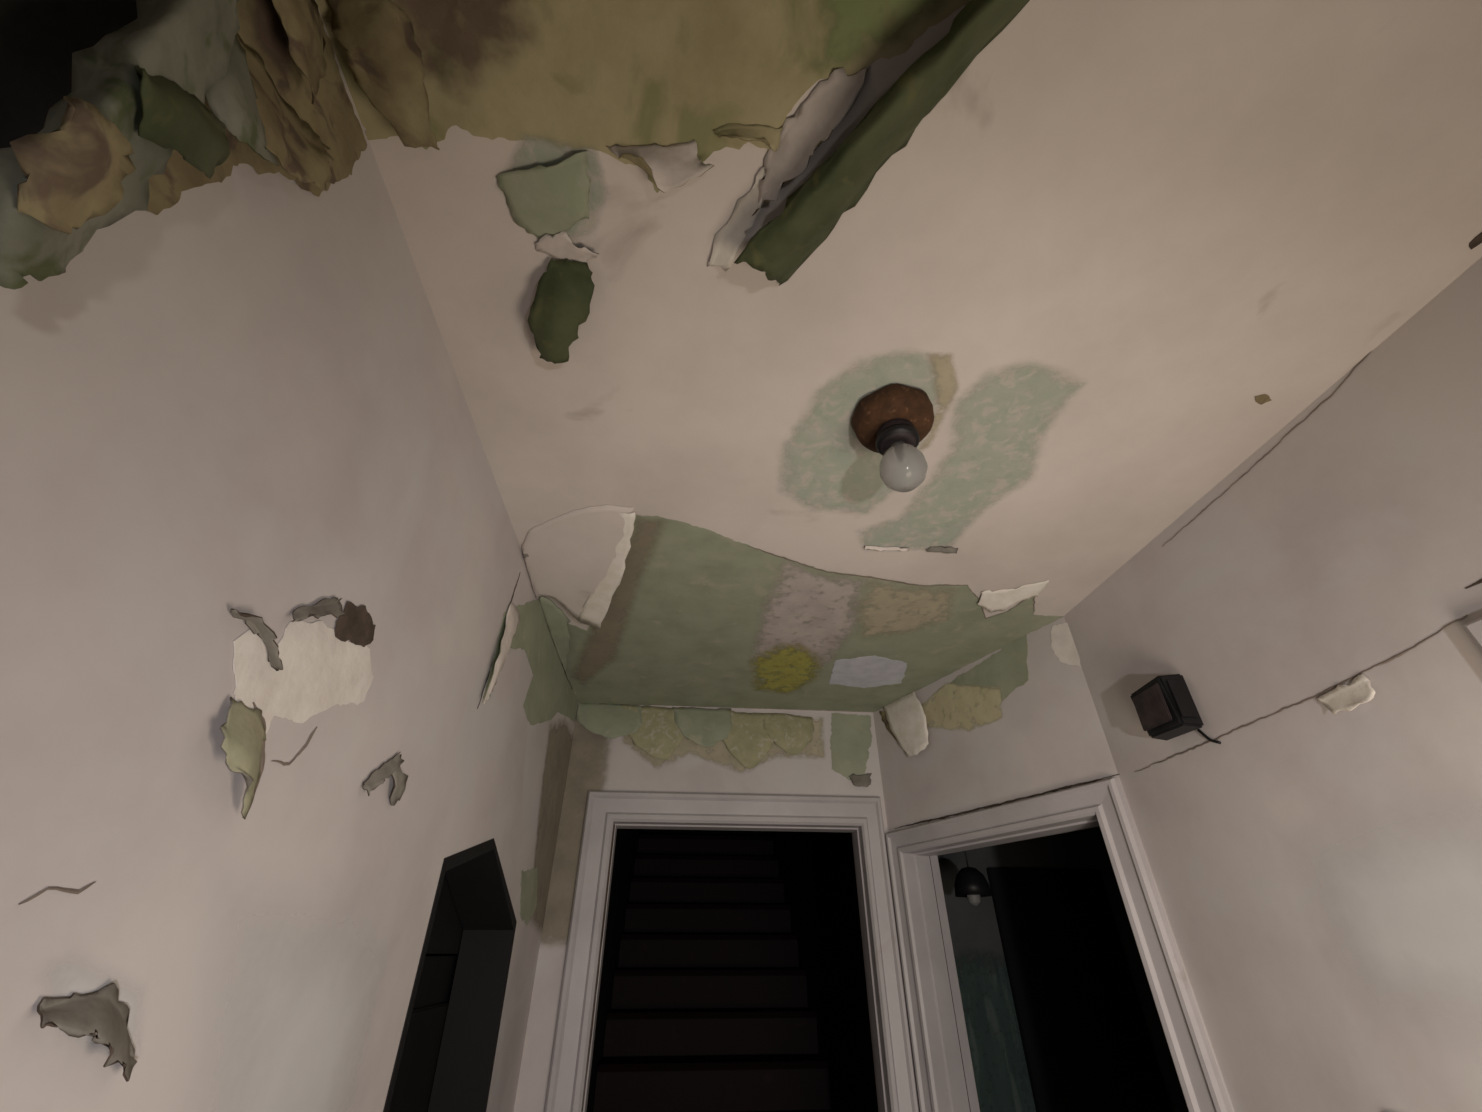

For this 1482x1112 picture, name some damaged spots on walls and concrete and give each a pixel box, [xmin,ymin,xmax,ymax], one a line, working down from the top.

peeling [0,0,1030,364]
peeling [784,354,1078,554]
flaking render [219,597,376,819]
peeling [362,752,408,806]
peeling [477,505,1081,787]
peeling [37,968,137,1082]